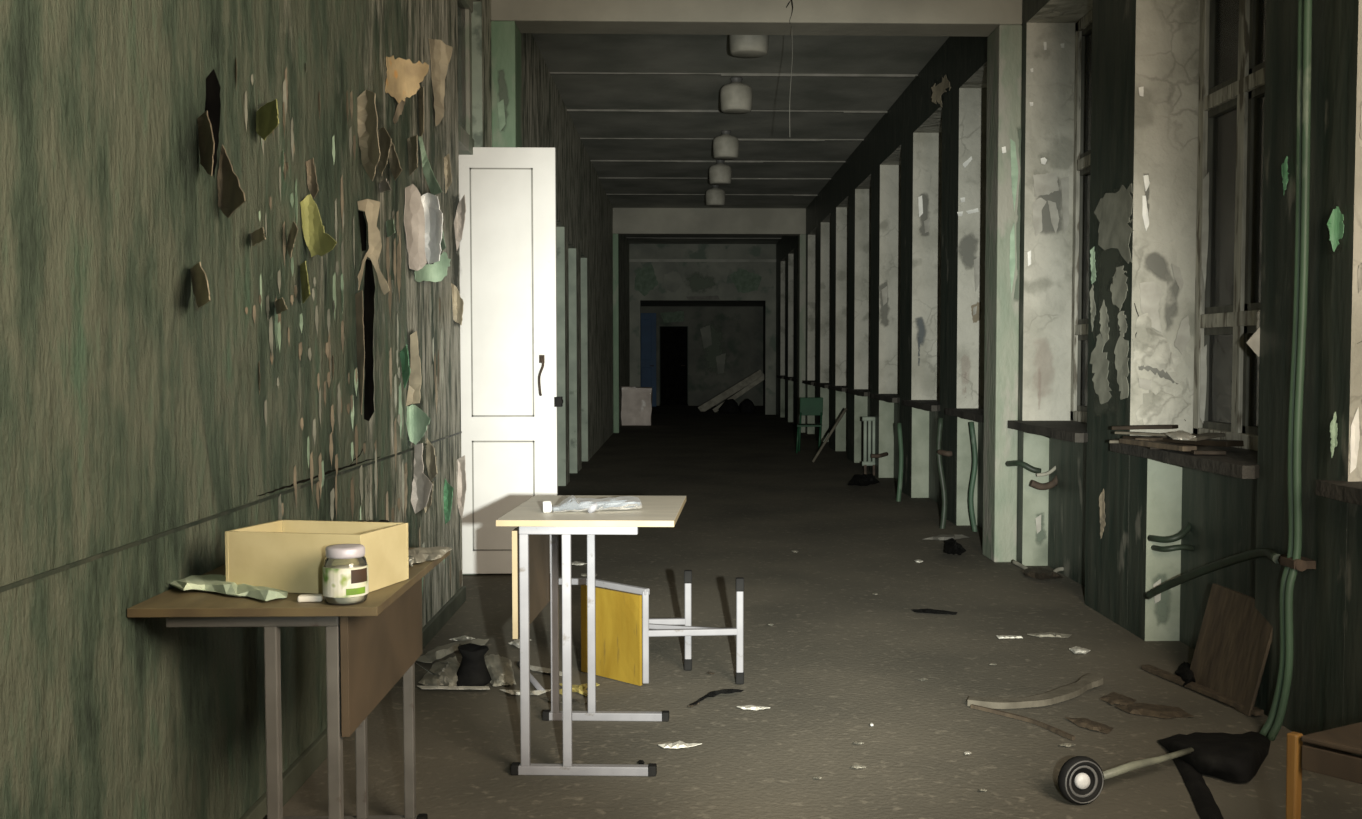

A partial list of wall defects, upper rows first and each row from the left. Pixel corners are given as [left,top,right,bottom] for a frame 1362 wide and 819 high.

peeling [235,38,467,548]
peeling [1002,129,1069,300]
peeling [1089,174,1207,422]